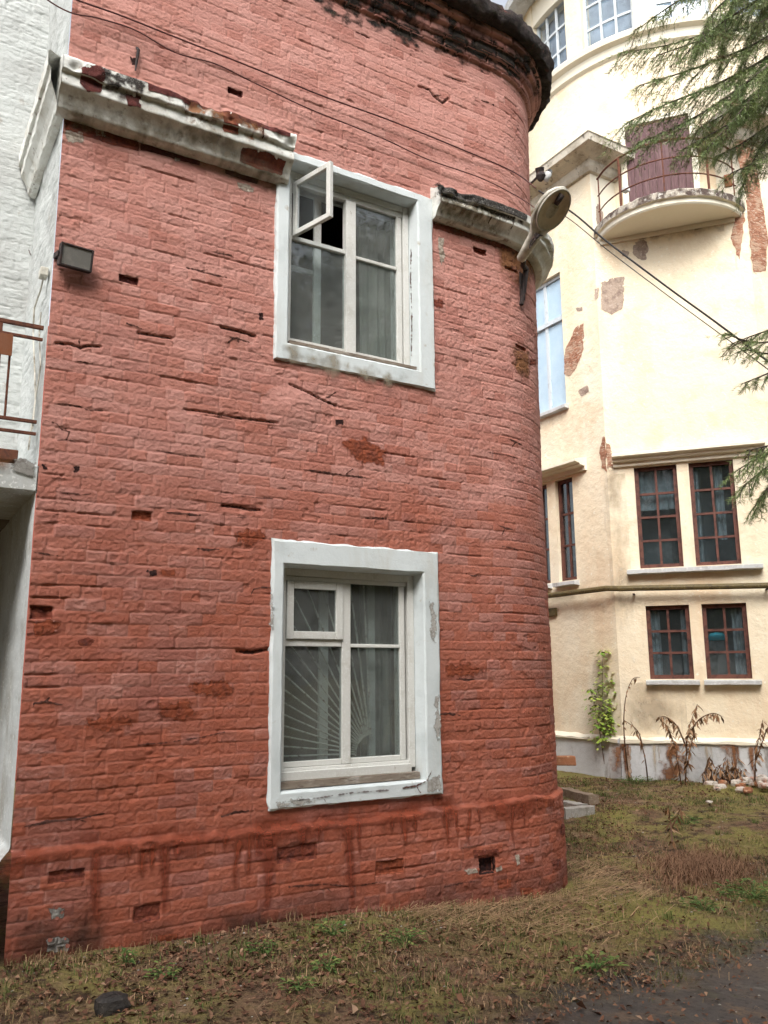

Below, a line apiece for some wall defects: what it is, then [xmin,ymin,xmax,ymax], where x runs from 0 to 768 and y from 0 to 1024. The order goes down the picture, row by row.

spalling [80,64,106,92]
flaking render [126,82,291,137]
flaking render [65,119,200,165]
flaking render [225,148,286,192]
flaking render [731,139,768,273]
flaking render [564,324,585,376]
spalling [342,436,386,466]
flaking render [599,437,613,472]
water stain [76,800,535,949]